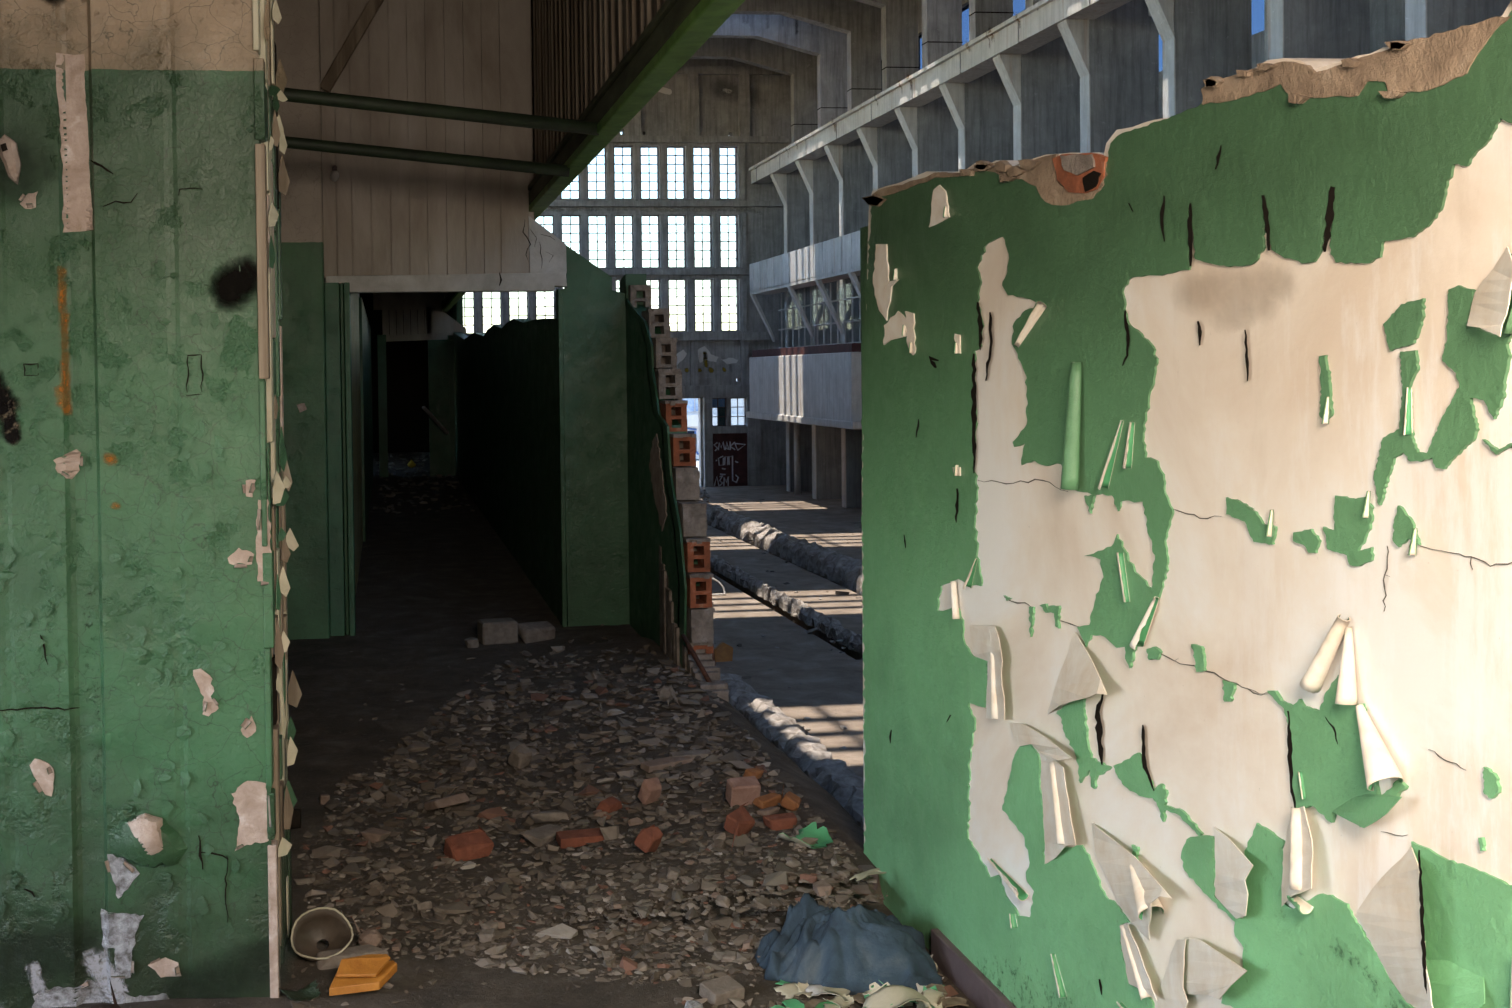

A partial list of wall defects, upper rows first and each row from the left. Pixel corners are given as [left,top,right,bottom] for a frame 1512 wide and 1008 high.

peeling [55,53,93,233]
peeling [18,192,37,209]
rust [58,269,71,414]
peeling [53,449,84,479]
peeling [861,11,1512,1008]
crack [1383,546,1512,611]
peeling [228,395,302,874]
peeling [193,668,219,716]
peeling [30,759,54,796]
peeling [32,854,181,1008]
peeling [774,980,938,1008]